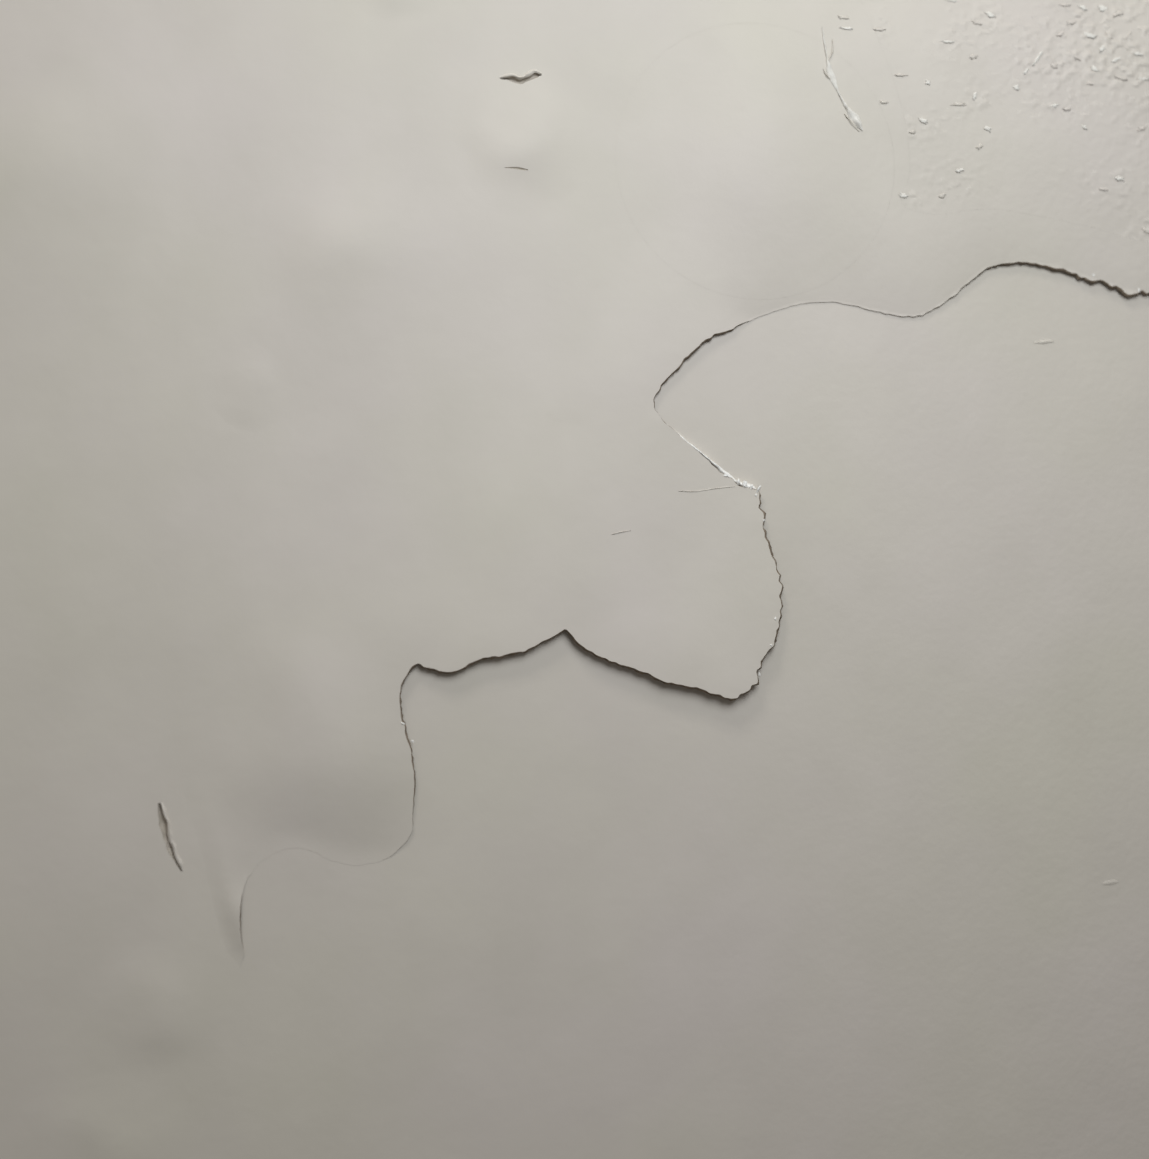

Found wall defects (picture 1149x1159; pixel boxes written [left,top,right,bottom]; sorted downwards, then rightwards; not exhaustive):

crack [500,69,542,84]
flaking render [165,0,1149,968]
crack [158,802,184,871]